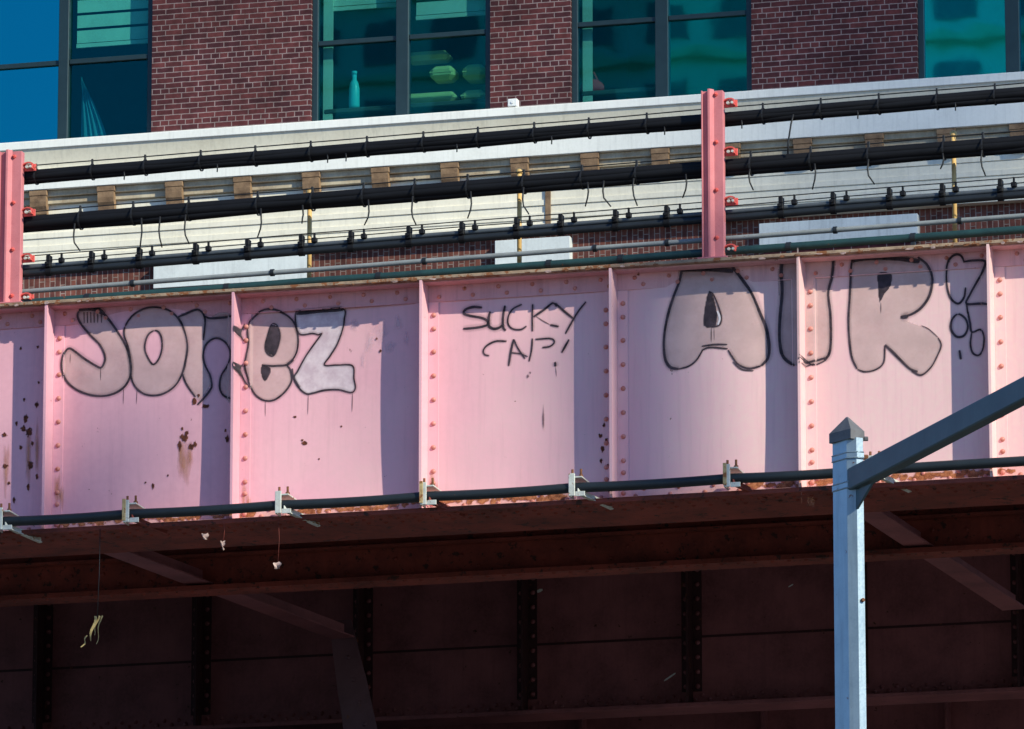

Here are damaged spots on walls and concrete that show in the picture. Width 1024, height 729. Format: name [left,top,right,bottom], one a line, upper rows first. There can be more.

rust [2,398,39,491]
rust [177,427,197,469]
rust [746,478,833,502]
rust [882,468,1015,482]